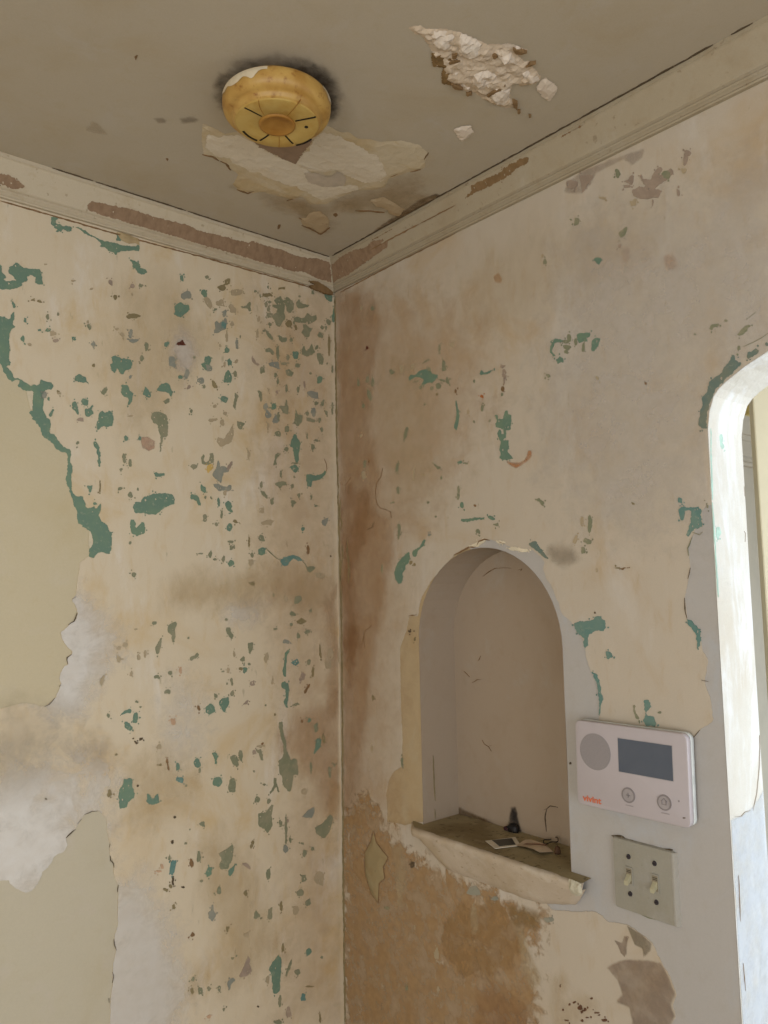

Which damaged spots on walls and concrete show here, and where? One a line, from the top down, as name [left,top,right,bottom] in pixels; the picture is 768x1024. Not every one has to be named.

spalling [409,25,557,118]
peeling [201,124,429,235]
peeling [465,157,529,199]
peeling [614,148,691,209]
peeling [51,201,388,588]
peeling [698,325,768,432]
peeling [154,653,199,694]
peeling [107,700,144,744]
peeling [450,486,768,1024]